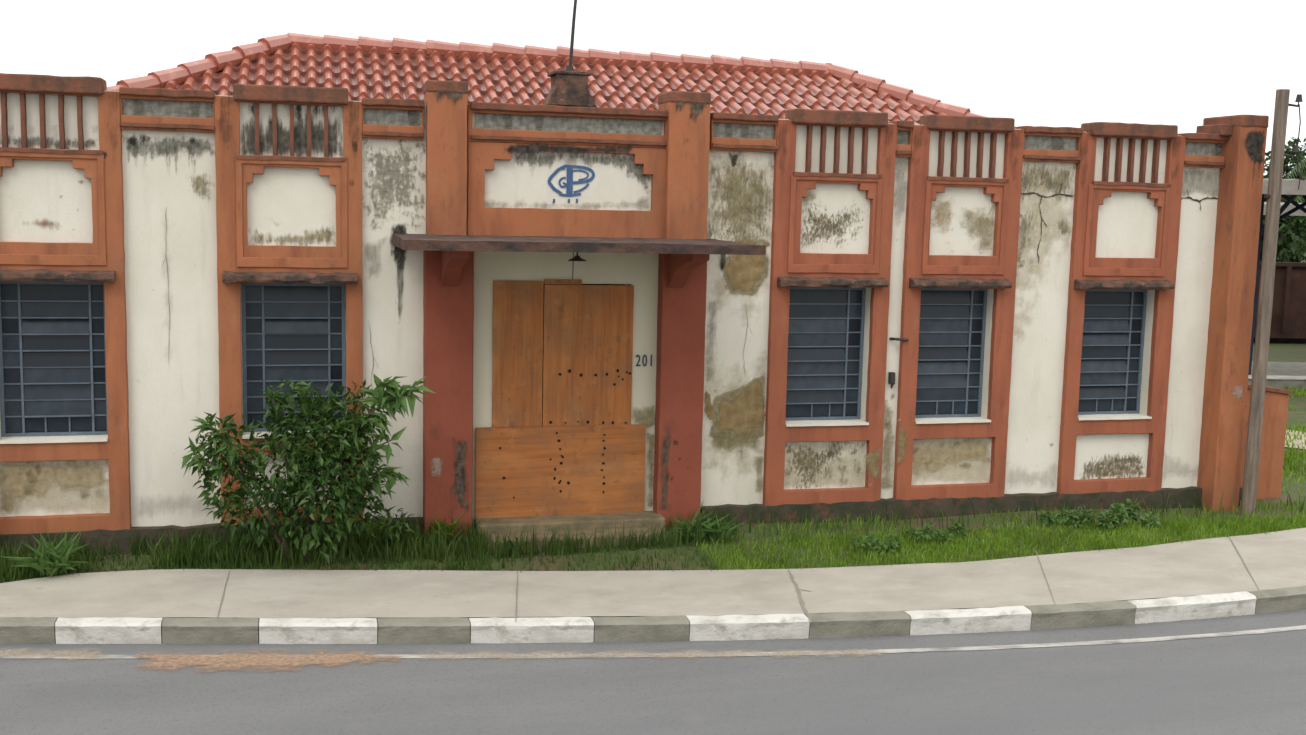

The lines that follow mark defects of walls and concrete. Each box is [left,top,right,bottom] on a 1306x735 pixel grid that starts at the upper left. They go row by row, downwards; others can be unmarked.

leakage [0,137,106,158]
leakage [475,113,663,207]
leakage [713,123,774,140]
leakage [123,99,425,315]
flaking render [718,183,770,295]
leakage [802,194,863,246]
leakage [966,212,993,248]
crack [1021,184,1074,263]
flaking render [705,376,765,441]
leakage [0,462,105,511]
leakage [786,444,860,488]
leakage [1081,455,1142,480]